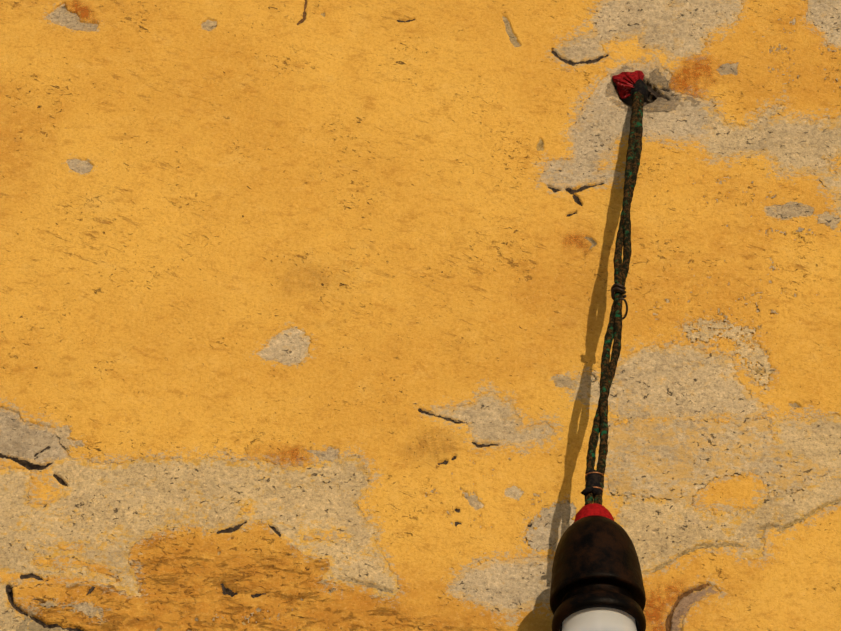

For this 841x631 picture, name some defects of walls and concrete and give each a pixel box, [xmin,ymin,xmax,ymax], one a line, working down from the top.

peeling [45,4,98,32]
peeling [256,326,310,366]
peeling [429,392,554,448]
peeling [0,408,400,631]
crack [757,500,841,532]
peeling [446,483,577,614]
crack [641,542,745,574]
crack [5,574,83,631]